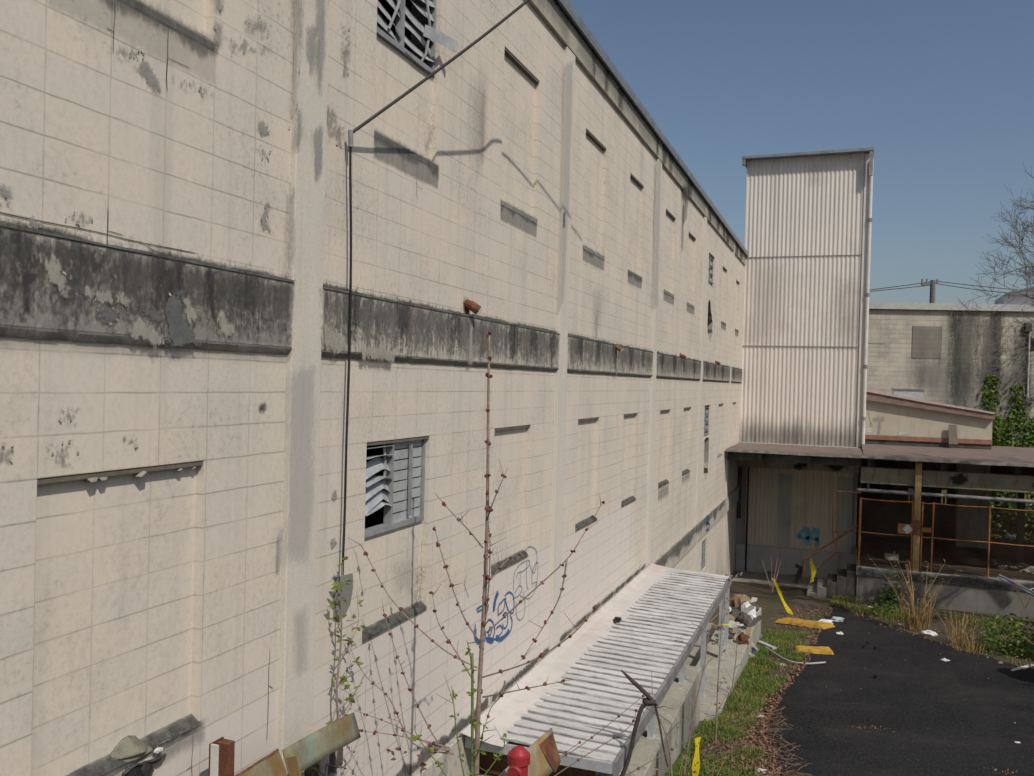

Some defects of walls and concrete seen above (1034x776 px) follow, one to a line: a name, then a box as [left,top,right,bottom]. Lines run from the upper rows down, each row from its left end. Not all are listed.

peeling [40,253,71,296]
damp [0,221,293,338]
damp [628,270,642,288]
peeling [84,285,197,349]
peeling [217,308,234,339]
damp [323,284,742,380]
damp [946,312,1031,431]
spalling [122,747,166,776]